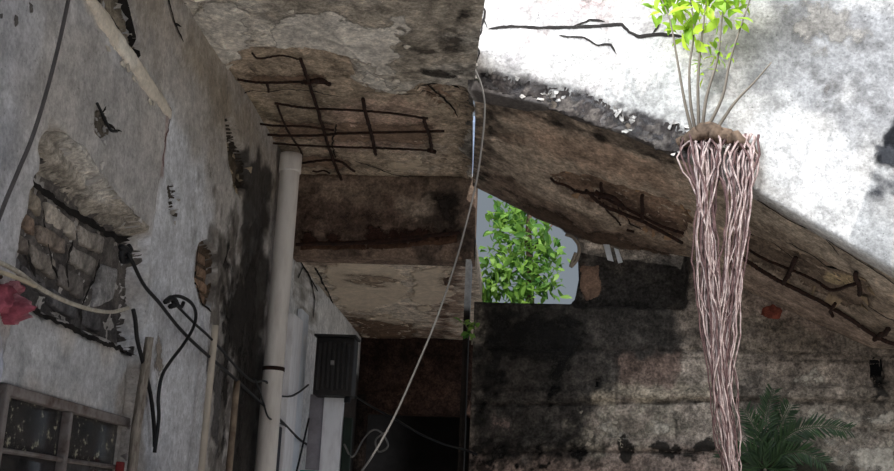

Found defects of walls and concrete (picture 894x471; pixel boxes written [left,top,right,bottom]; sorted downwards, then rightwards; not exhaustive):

flaking render [97,0,146,68]
crack [168,0,184,42]
crack [476,8,682,63]
spalling [183,0,475,181]
flaking render [475,63,689,159]
water stain [869,123,894,199]
flaking render [15,131,150,357]
flaking render [194,241,212,312]
water stain [211,244,256,461]
water stain [480,312,588,410]
water stain [515,421,635,471]
water stain [648,421,716,461]